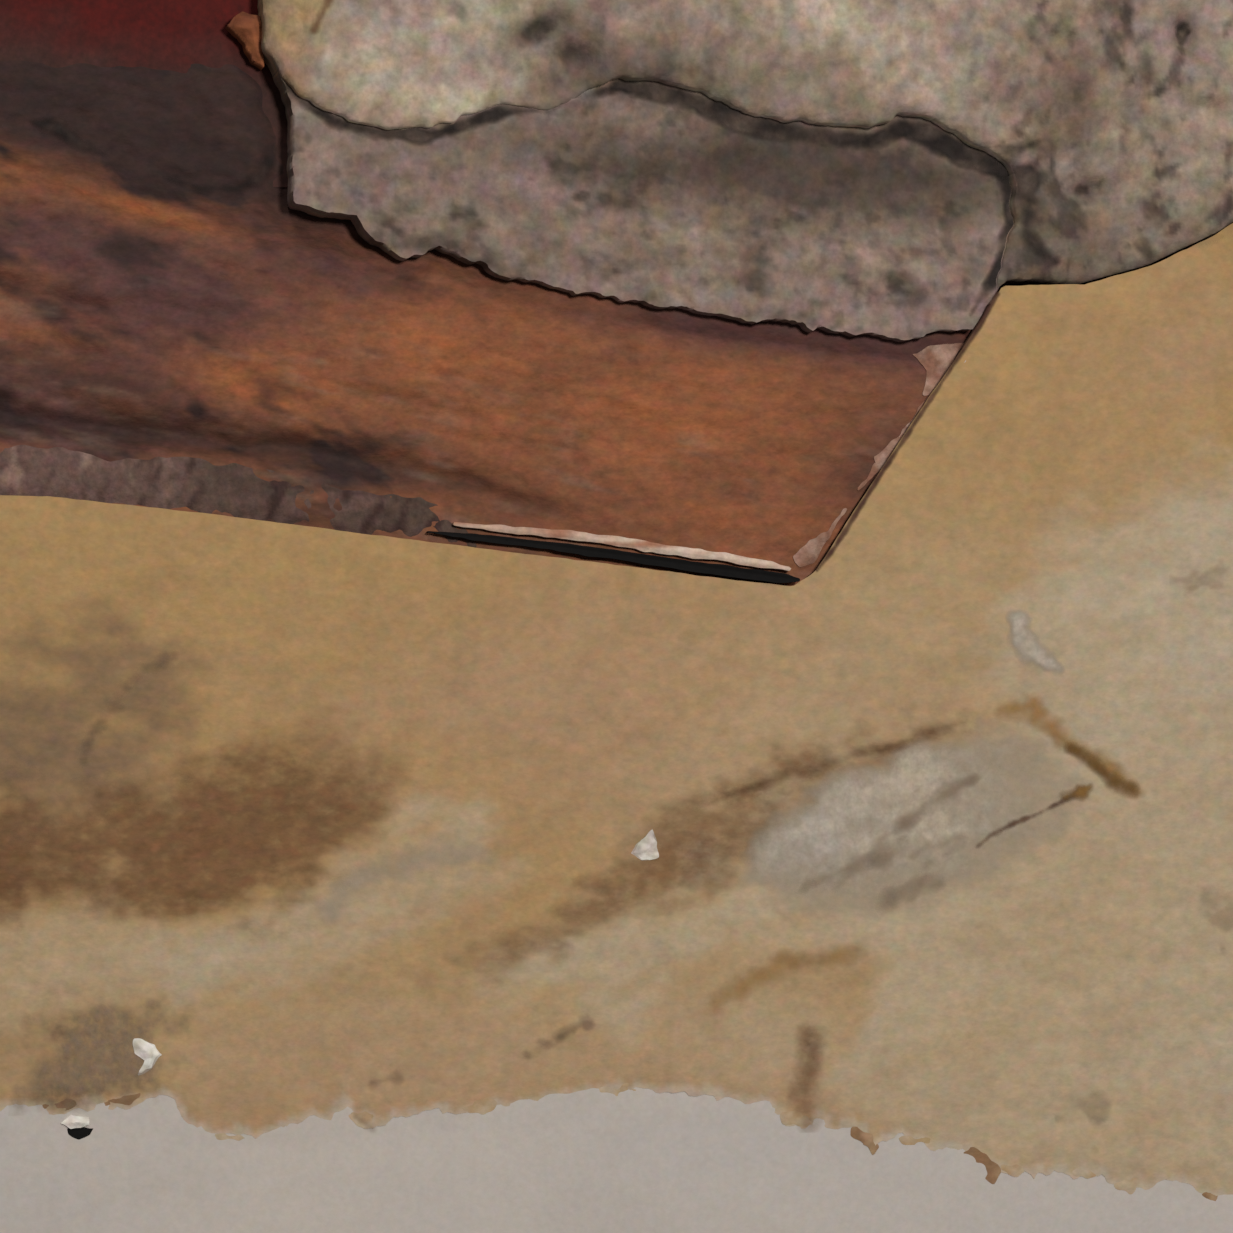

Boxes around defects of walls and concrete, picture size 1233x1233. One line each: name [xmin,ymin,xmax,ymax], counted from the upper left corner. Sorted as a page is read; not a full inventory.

crack [289,88,519,144]
flaking render [0,60,971,586]
crack [426,81,1058,583]
leakage [0,757,372,913]
peeling [0,223,1233,1201]
corrosion [1011,699,1135,791]
corrosion [1065,786,1091,798]